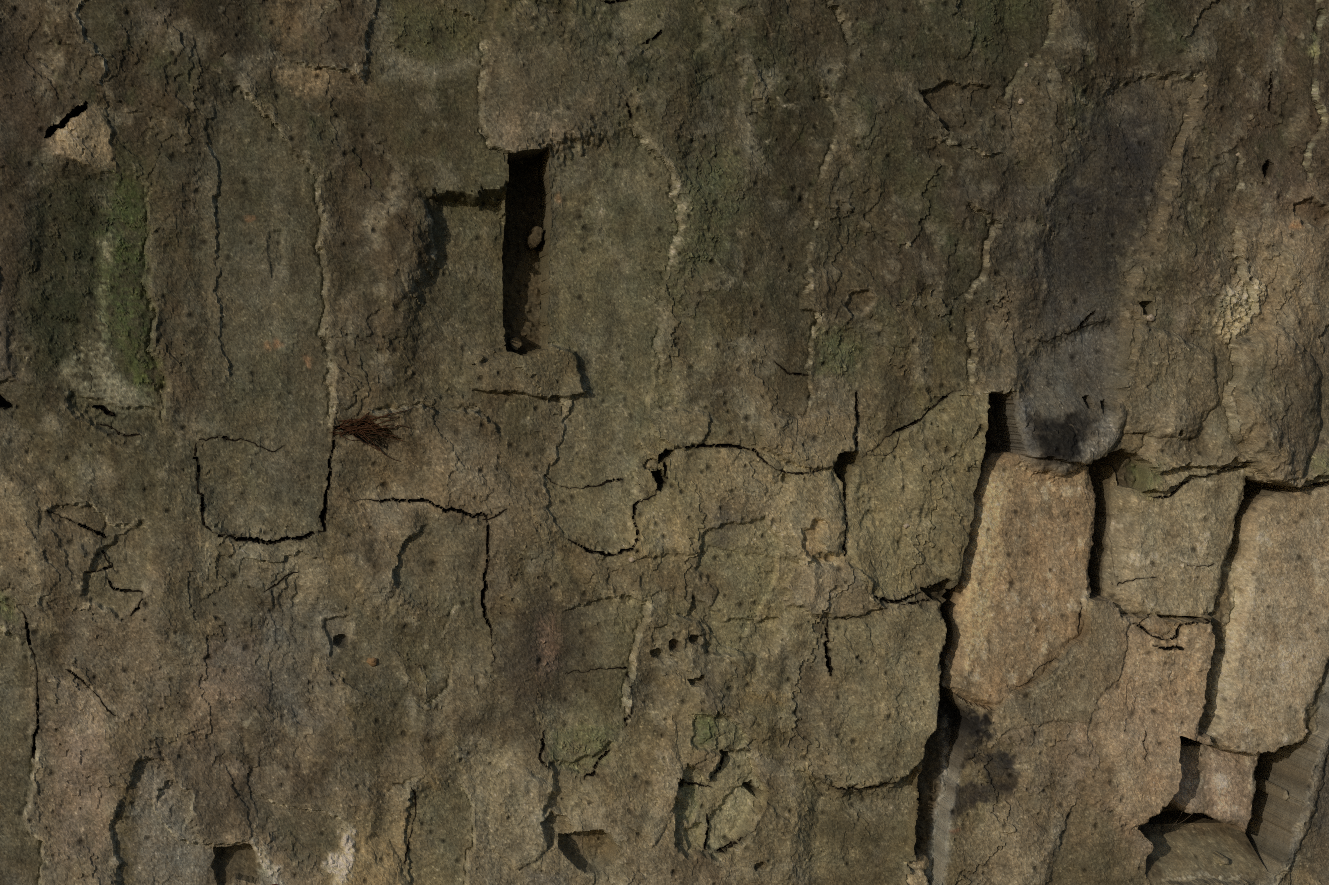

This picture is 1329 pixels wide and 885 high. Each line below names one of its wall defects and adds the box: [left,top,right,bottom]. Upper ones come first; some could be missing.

leakage [1035,289,1128,343]
crack [544,390,961,556]
crack [193,424,506,662]
crack [816,579,949,676]
peeling [149,777,248,847]